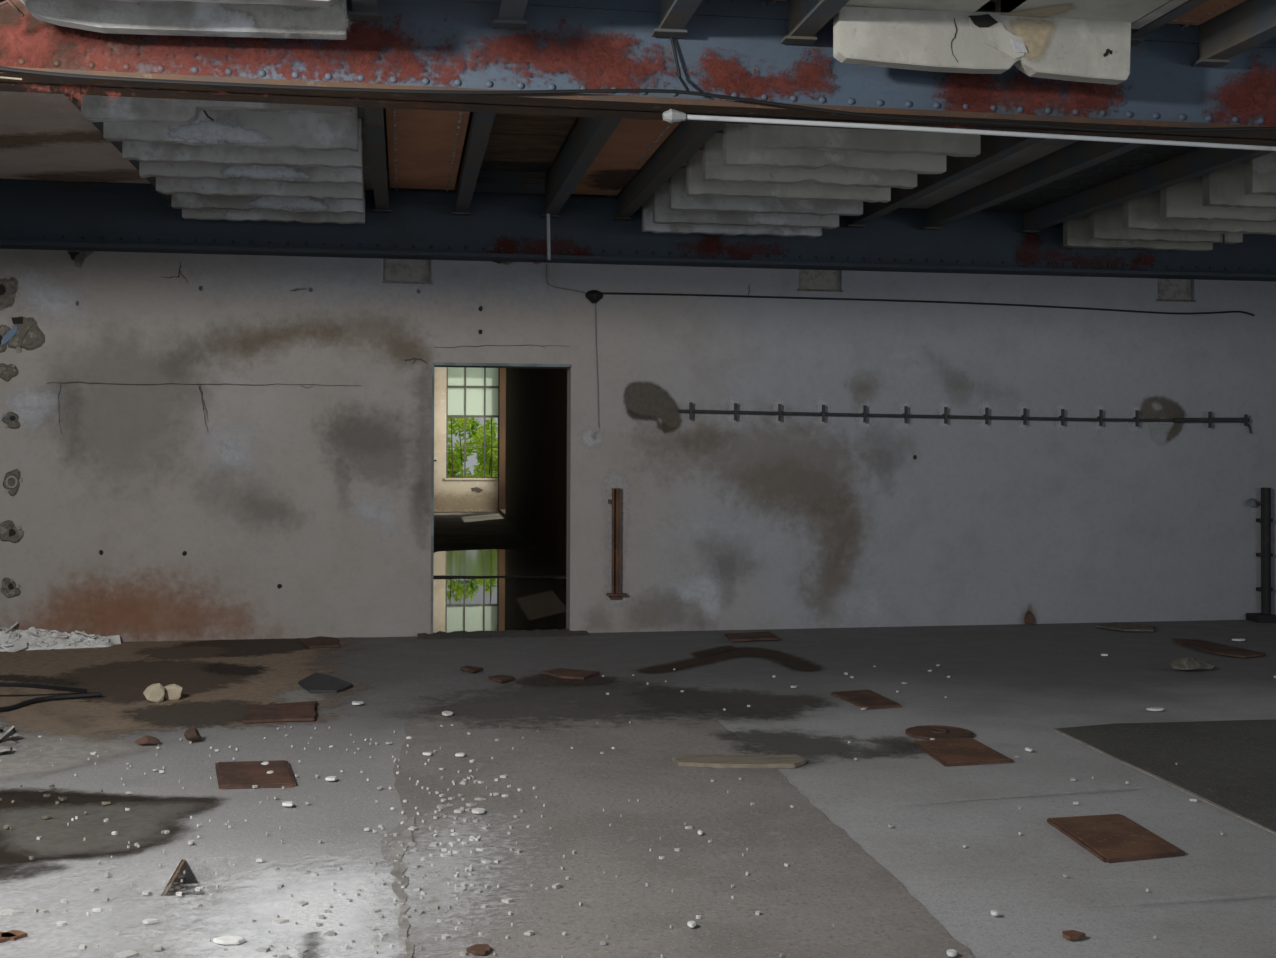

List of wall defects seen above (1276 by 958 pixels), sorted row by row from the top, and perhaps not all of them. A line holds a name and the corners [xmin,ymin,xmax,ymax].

spalling [0,277,45,382]
spalling [2,412,21,429]
spalling [3,469,22,496]
spalling [0,520,24,543]
water stain [670,576,724,616]